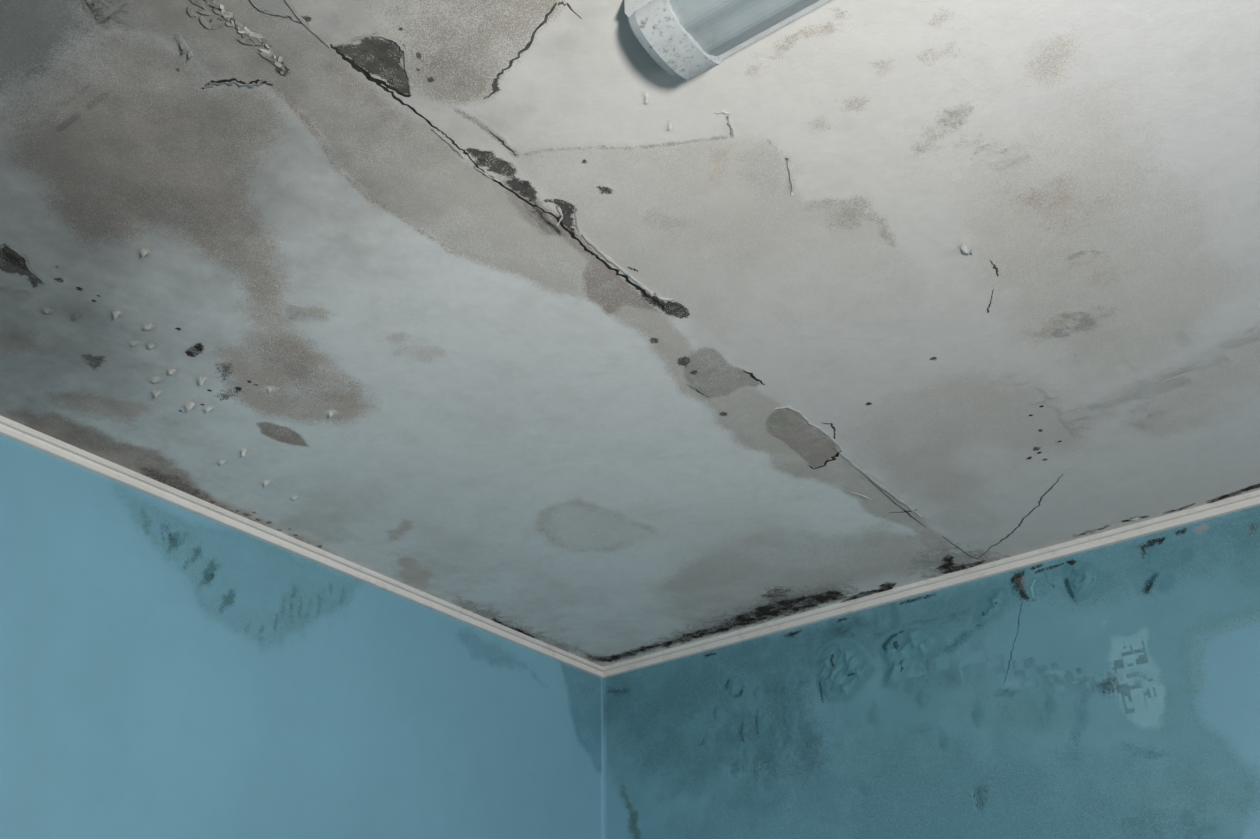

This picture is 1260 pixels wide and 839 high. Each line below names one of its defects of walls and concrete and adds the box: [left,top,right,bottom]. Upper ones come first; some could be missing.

spalling [0,243,99,302]
peeling [331,0,582,237]
crack [285,0,665,309]
leakage [0,0,1014,663]
spalling [635,288,690,319]
crack [833,447,1063,559]
leakage [1122,484,1260,522]
leakage [558,506,1260,839]